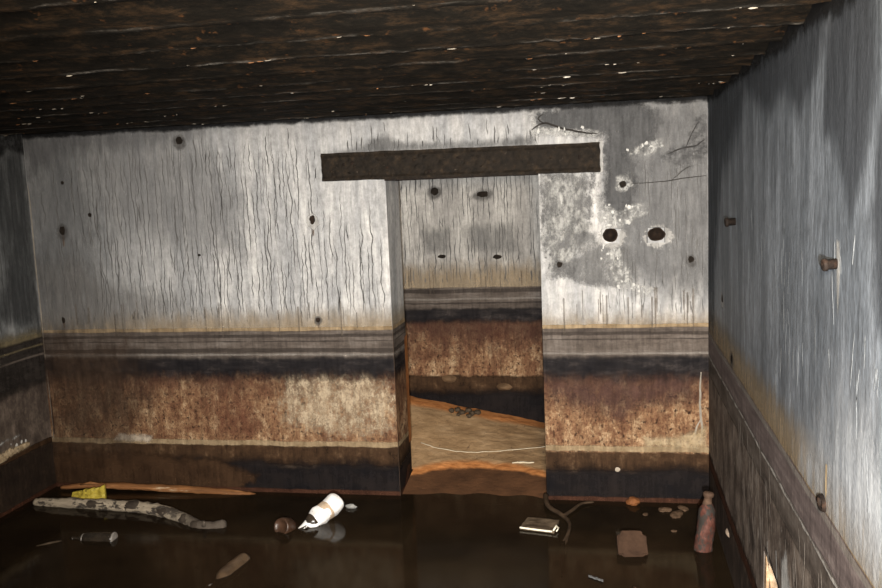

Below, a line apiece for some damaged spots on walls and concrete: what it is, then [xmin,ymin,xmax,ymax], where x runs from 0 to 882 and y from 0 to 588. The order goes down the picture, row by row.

damp [0,136,542,514]
rust [46,319,757,588]
peeling [531,104,664,298]
damp [409,81,882,588]
spalling [643,226,674,248]